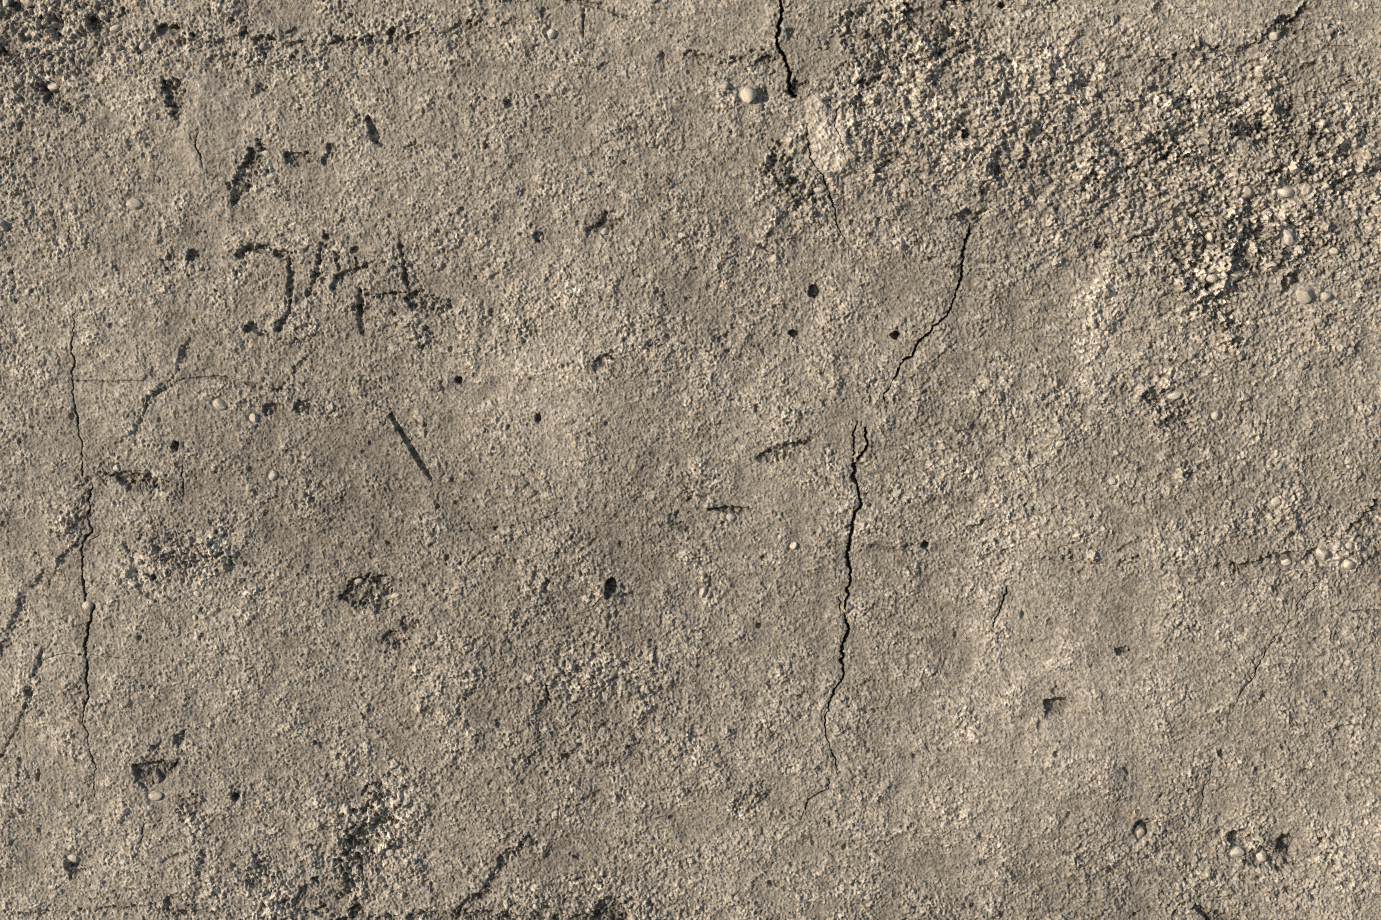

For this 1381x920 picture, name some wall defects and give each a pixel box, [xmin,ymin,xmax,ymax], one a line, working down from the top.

crack [64,212,72,248]
crack [772,0,852,260]
crack [44,306,141,800]
crack [799,222,974,822]